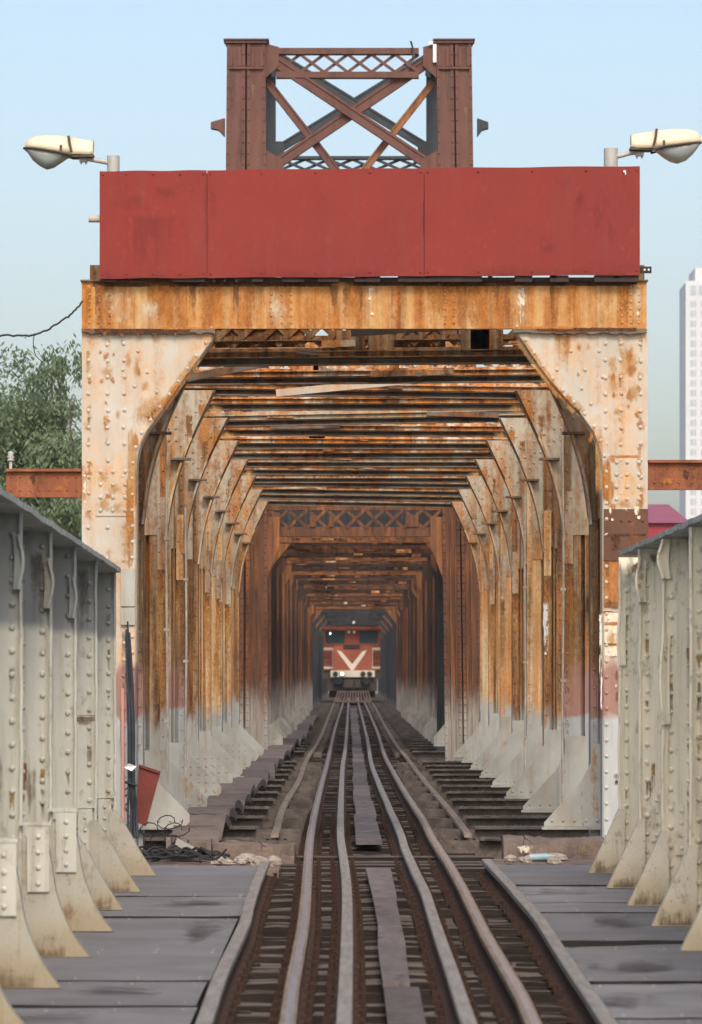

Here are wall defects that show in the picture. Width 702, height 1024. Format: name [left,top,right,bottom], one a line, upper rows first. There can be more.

corrosion [87,282,642,431]
corrosion [85,435,139,566]
corrosion [186,404,221,438]
corrosion [497,430,525,451]
corrosion [512,404,543,440]
corrosion [589,429,643,509]
corrosion [157,570,183,652]
corrosion [205,593,231,664]
corrosion [489,594,518,664]
corrosion [603,533,646,622]